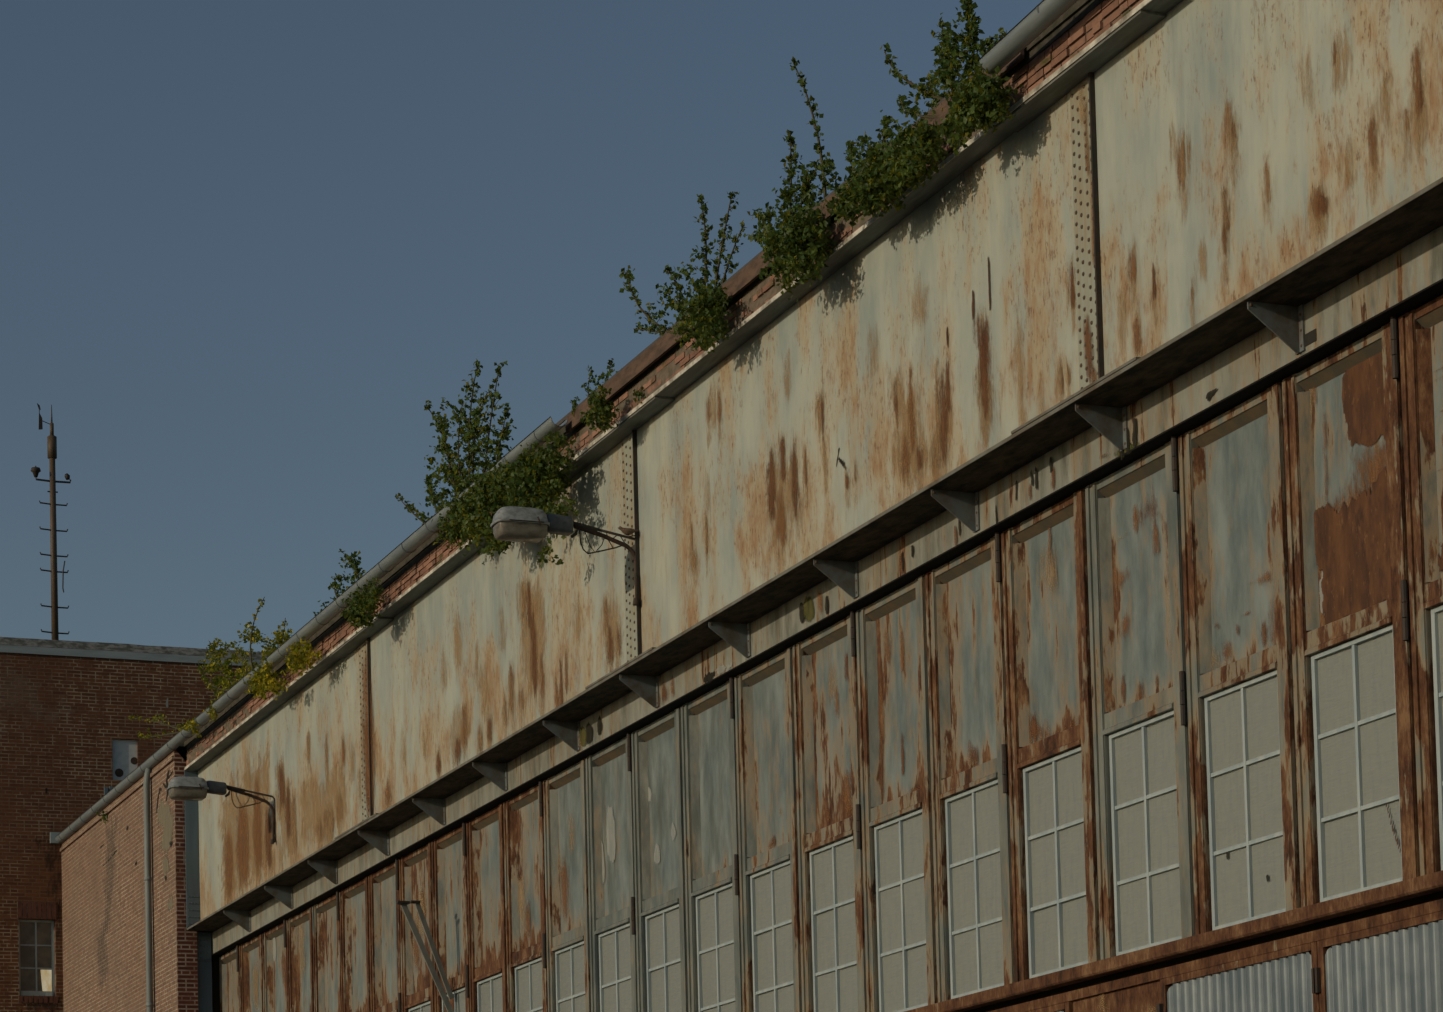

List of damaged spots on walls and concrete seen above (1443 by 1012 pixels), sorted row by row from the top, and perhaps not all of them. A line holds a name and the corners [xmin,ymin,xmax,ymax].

rust [1170,137,1189,207]
rust [1222,190,1230,279]
rust [1309,186,1327,228]
rust [1368,75,1387,189]
rust [1403,49,1425,152]
rust [893,327,952,489]
rust [972,258,991,428]
rust [1057,267,1096,398]
rust [766,396,827,556]
rust [422,579,568,778]
rust [605,600,621,672]
rust [221,658,392,904]